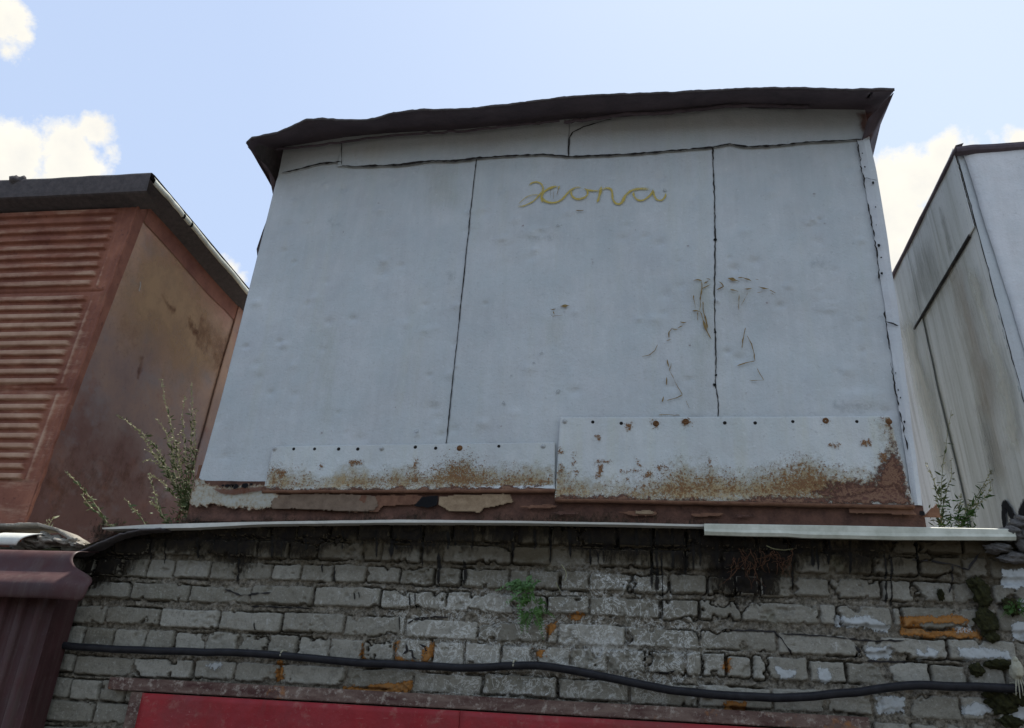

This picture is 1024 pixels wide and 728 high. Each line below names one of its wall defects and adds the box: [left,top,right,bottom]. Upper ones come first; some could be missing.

peeling [189,478,280,512]
rust [213,417,914,504]
water stain [80,511,903,617]